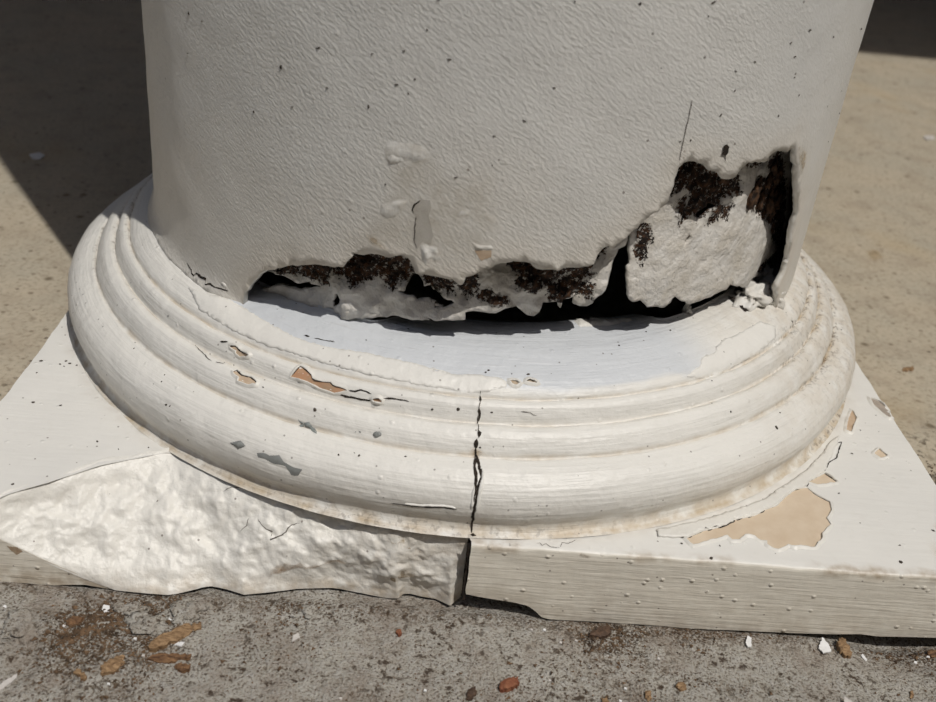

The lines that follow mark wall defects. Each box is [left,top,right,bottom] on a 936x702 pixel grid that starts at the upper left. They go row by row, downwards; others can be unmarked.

peeling [412,200,441,265]
peeling [189,288,541,406]
spalling [0,448,468,605]
crack [392,391,485,600]
peeling [683,471,841,552]